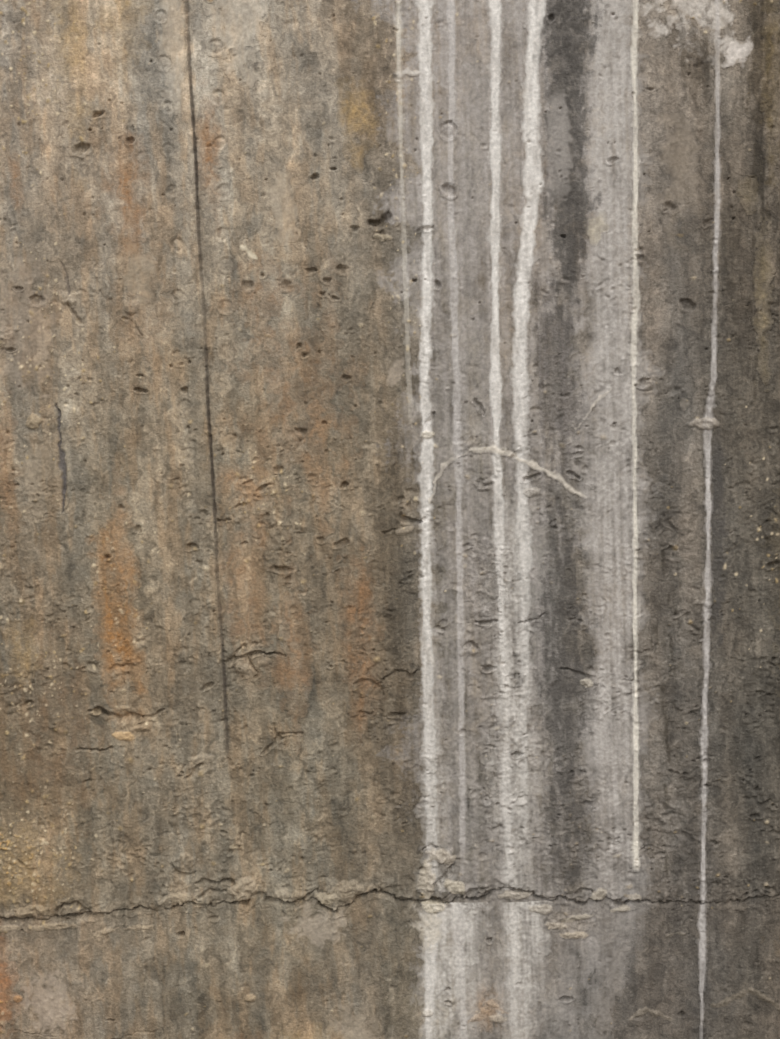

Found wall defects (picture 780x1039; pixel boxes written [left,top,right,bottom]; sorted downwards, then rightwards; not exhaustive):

rust [94,113,153,255]
damp [313,0,780,1039]
rust [84,458,153,732]
crack [348,678,375,721]
crack [0,840,780,932]